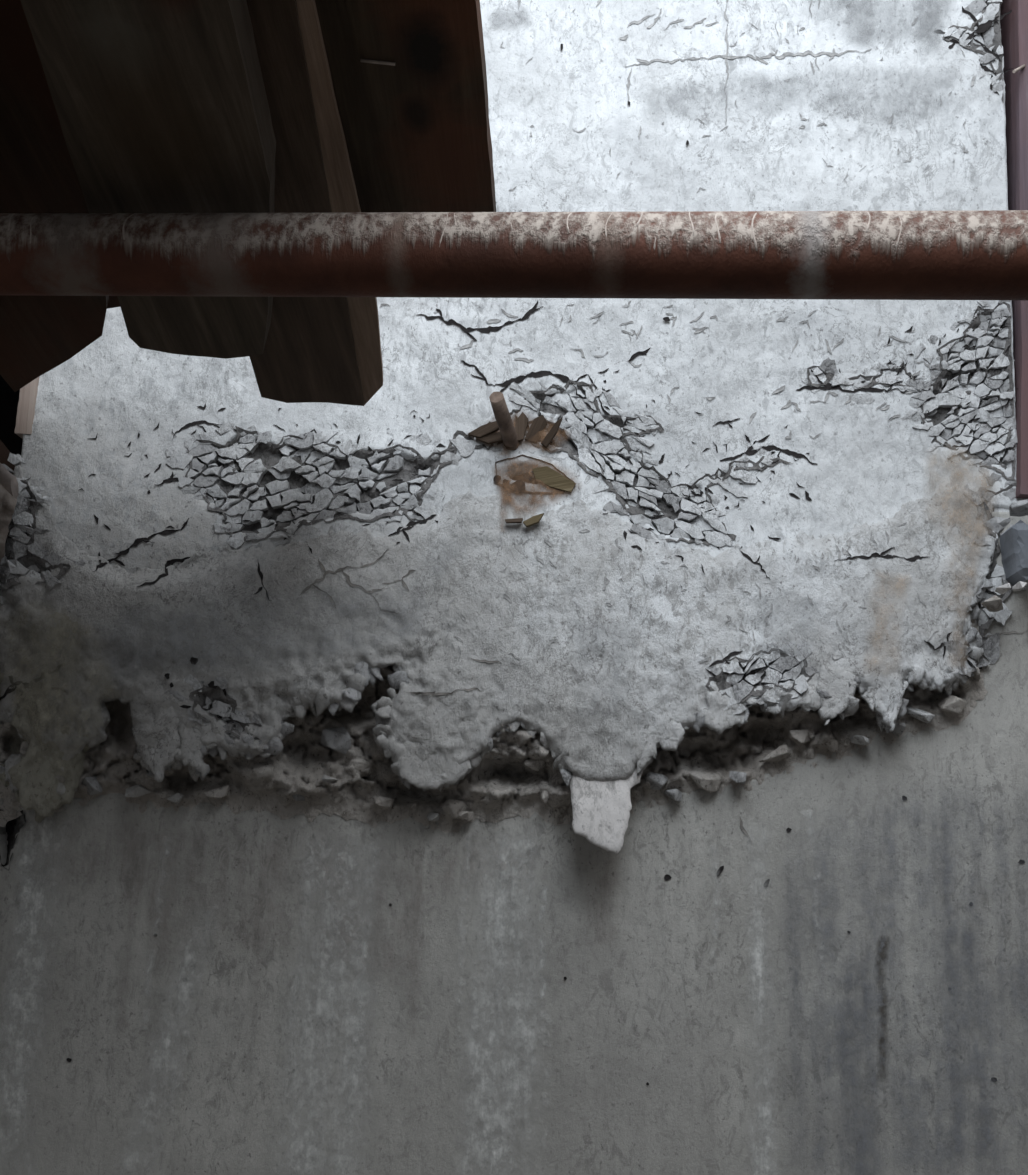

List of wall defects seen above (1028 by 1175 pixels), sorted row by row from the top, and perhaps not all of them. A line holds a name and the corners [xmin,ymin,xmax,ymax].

crack [911,0,1012,105]
crack [888,114,912,162]
spalling [0,453,86,605]
crack [79,474,193,587]
crack [127,404,446,614]
corrosion [495,430,564,510]
crack [417,301,1018,677]
spalling [630,300,1028,814]
crack [404,598,520,698]
spalling [0,700,30,870]
spalling [54,665,573,834]
damp [752,912,764,1011]